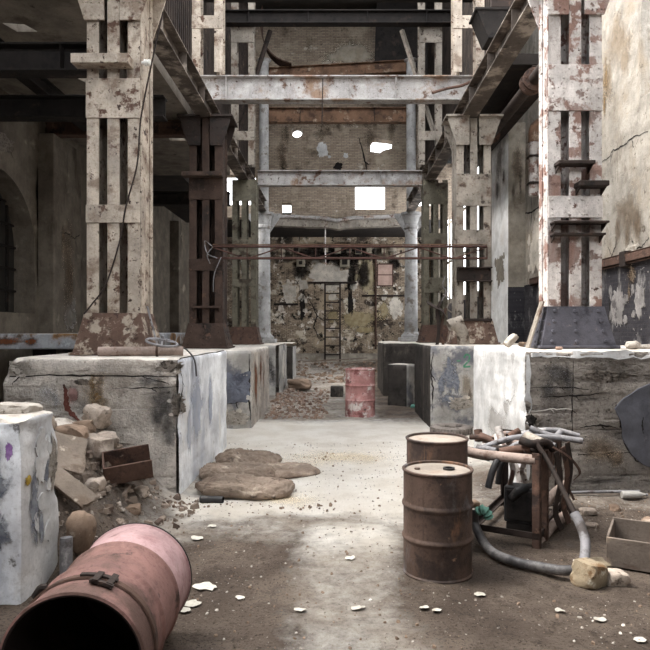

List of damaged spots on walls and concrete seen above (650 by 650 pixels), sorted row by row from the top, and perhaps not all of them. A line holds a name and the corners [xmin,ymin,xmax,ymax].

crack [602,131,648,162]
flaking render [278,260,404,320]
peeling [609,281,645,327]
rust [63,384,80,421]
crack [9,367,185,418]
damp [153,386,175,444]
damp [438,356,471,402]
peeling [34,427,58,542]